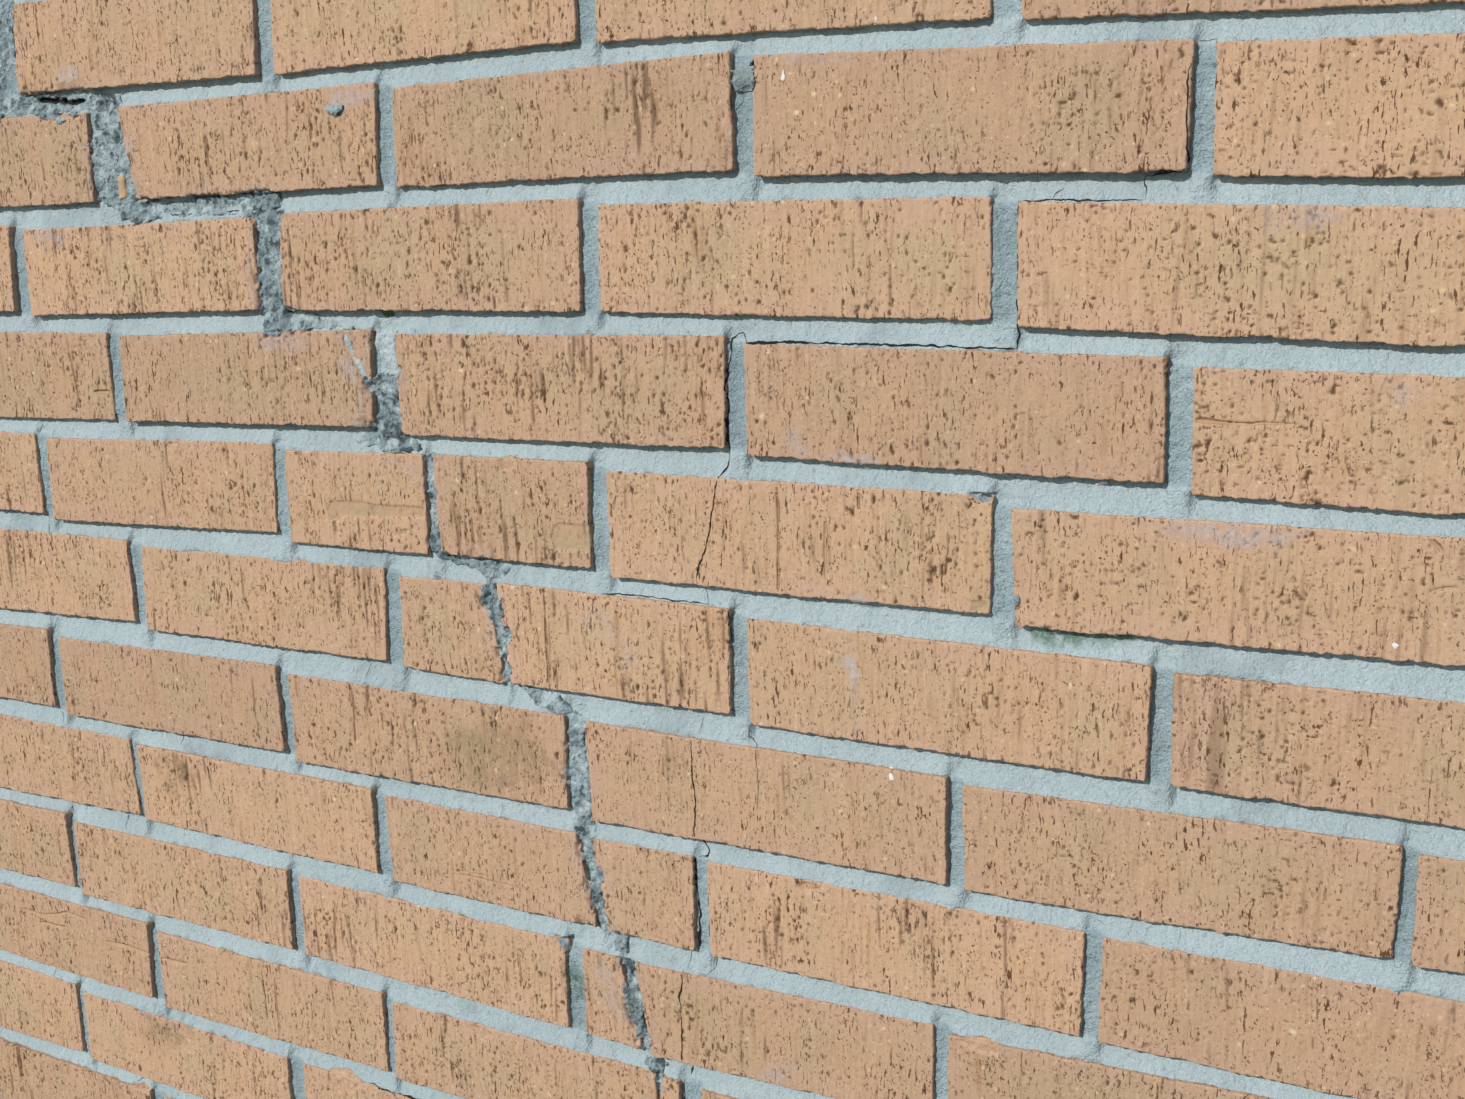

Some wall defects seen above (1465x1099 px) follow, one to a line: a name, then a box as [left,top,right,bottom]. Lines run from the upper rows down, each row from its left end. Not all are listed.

crack [0,0,718,1099]
crack [602,39,1217,804]